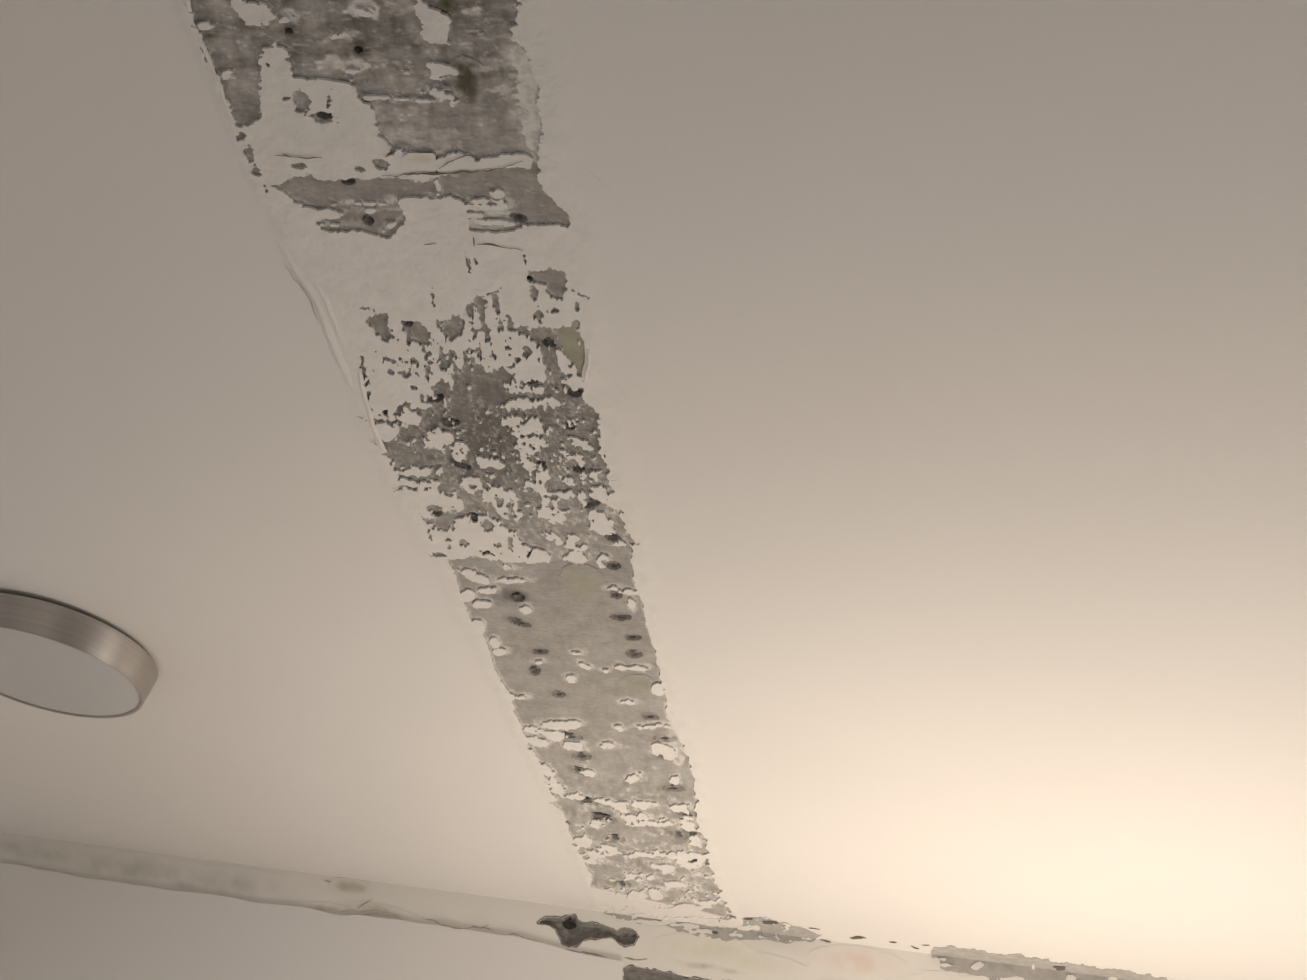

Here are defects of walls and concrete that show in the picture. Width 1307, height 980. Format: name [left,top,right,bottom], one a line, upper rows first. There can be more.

peeling [172,0,822,948]
spalling [623,964,709,980]
peeling [931,945,1167,980]